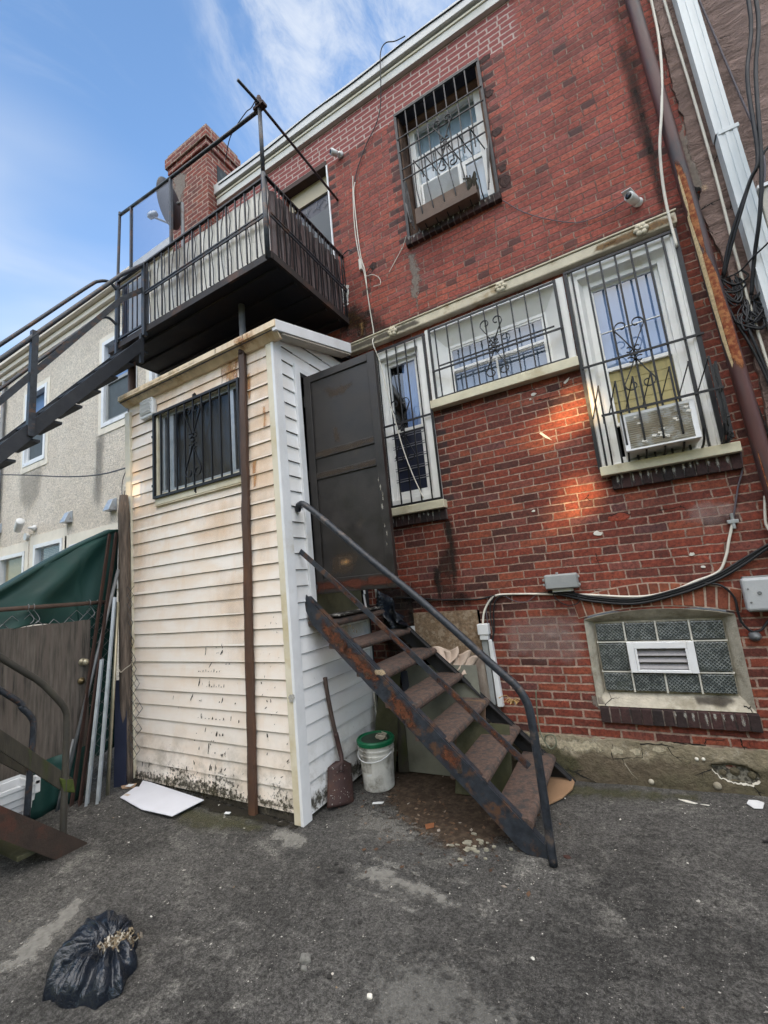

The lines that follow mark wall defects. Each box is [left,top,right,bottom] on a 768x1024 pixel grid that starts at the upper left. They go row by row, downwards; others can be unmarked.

damp [393,510,456,597]
corrosion [321,623,386,688]
corrosion [388,692,415,727]
damp [135,767,293,815]
crack [611,739,750,776]
spalling [711,764,760,787]